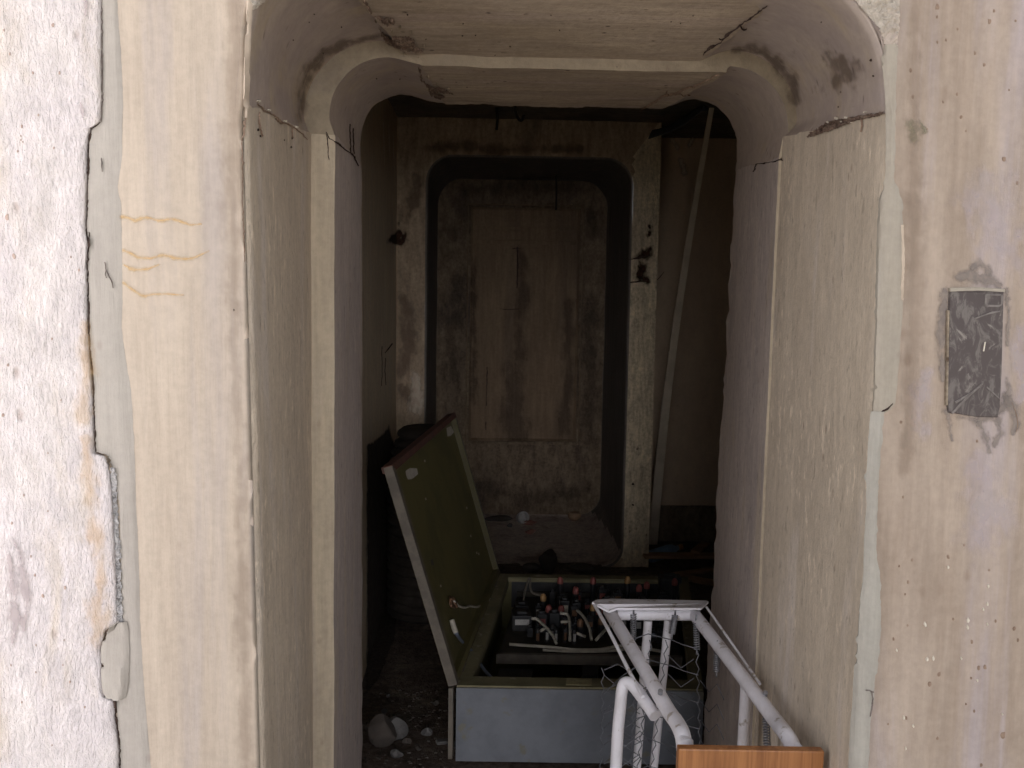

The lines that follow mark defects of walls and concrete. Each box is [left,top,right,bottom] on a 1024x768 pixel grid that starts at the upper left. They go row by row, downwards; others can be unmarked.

crack [703,6,767,56]
crack [241,100,359,262]
leakage [398,296,423,414]
spalling [104,453,123,623]